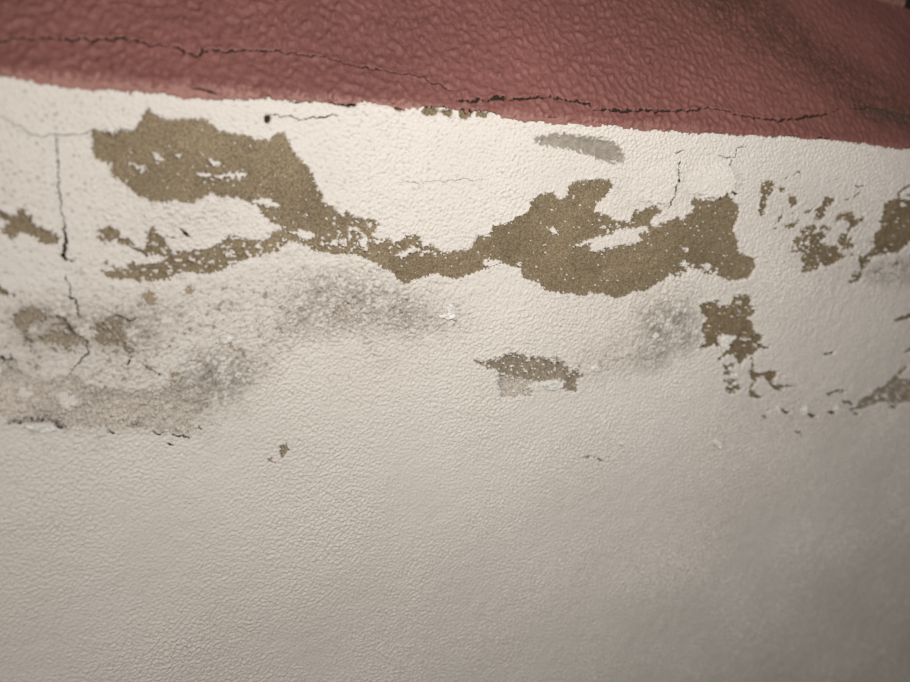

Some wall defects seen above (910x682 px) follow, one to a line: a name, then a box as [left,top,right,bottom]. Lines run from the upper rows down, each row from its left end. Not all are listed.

crack [0,36,908,122]
spalling [0,209,59,244]
crack [1,116,89,374]
spalling [91,107,755,305]
crack [668,150,683,209]
peeling [758,180,910,284]
flaking render [12,307,135,358]
spalling [473,353,601,397]
spalling [699,295,796,399]
spalling [852,366,910,410]